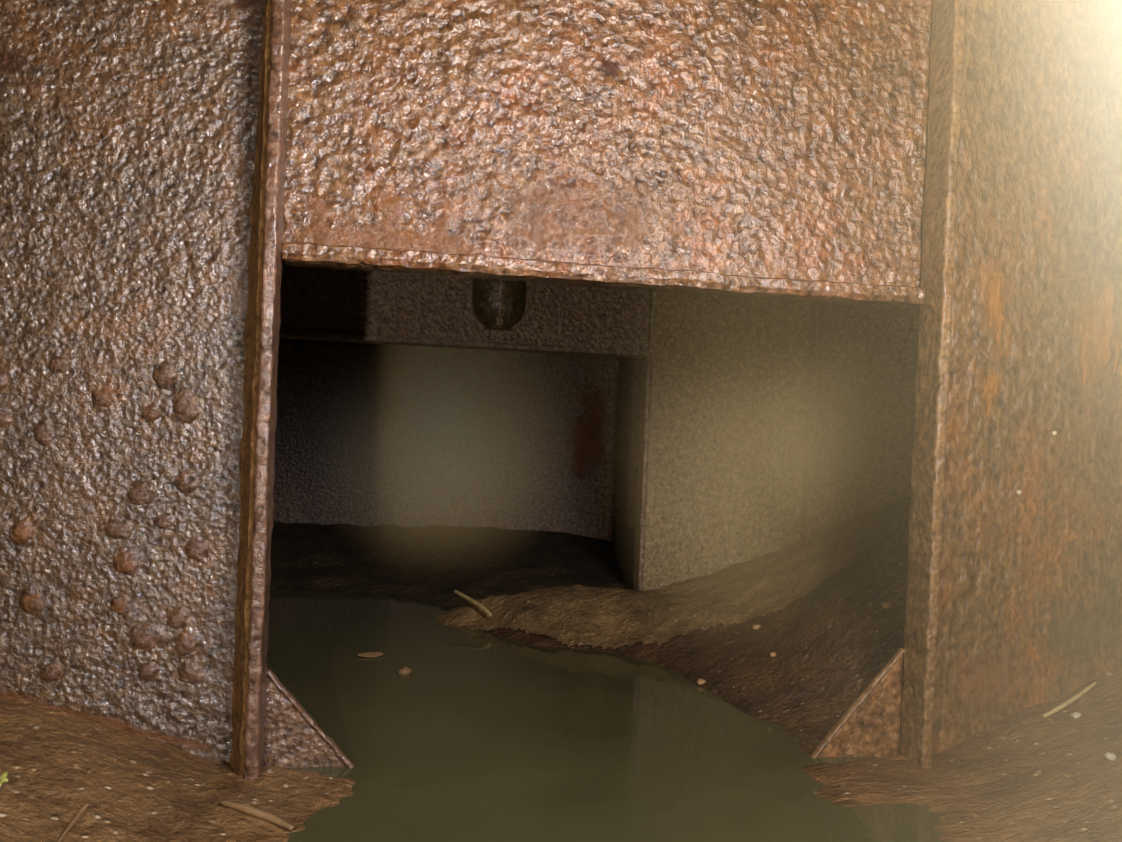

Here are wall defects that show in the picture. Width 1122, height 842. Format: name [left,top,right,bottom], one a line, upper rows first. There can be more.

rust [601,62,619,76]
rust [49,355,68,374]
rust [92,387,113,407]
rust [152,361,200,424]
rust [142,405,161,421]
rust [127,480,156,505]
rust [174,470,201,495]
rust [9,517,35,548]
rust [153,512,177,529]
rust [98,519,146,575]
rust [184,536,210,563]
rust [111,594,205,684]